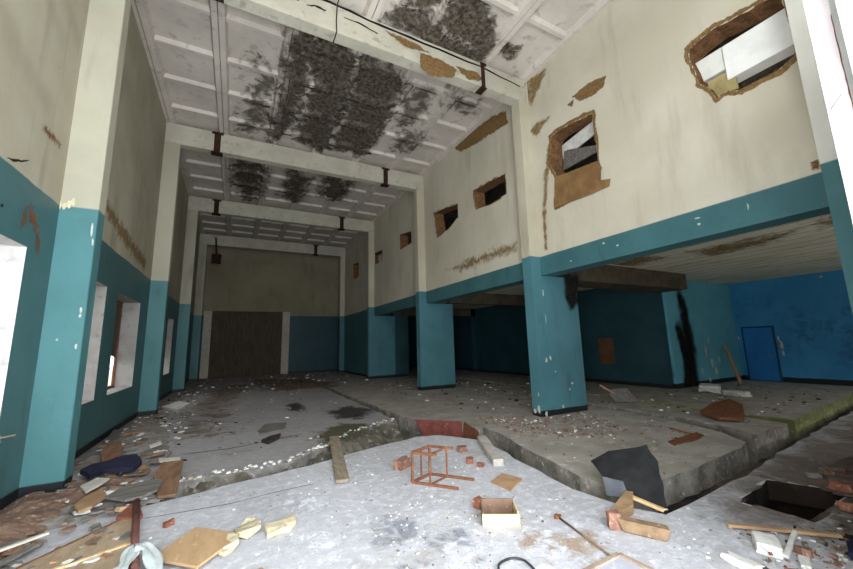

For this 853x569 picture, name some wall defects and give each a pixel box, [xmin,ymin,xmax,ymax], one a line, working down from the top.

spalling [386,30,481,81]
leakage [379,0,523,62]
spalling [684,0,797,102]
leakage [232,27,434,157]
leakage [448,92,481,115]
peeling [567,76,606,106]
peeling [455,111,508,152]
spalling [548,109,601,180]
leakage [228,159,271,201]
leakage [277,169,358,203]
corrosion [22,206,40,252]